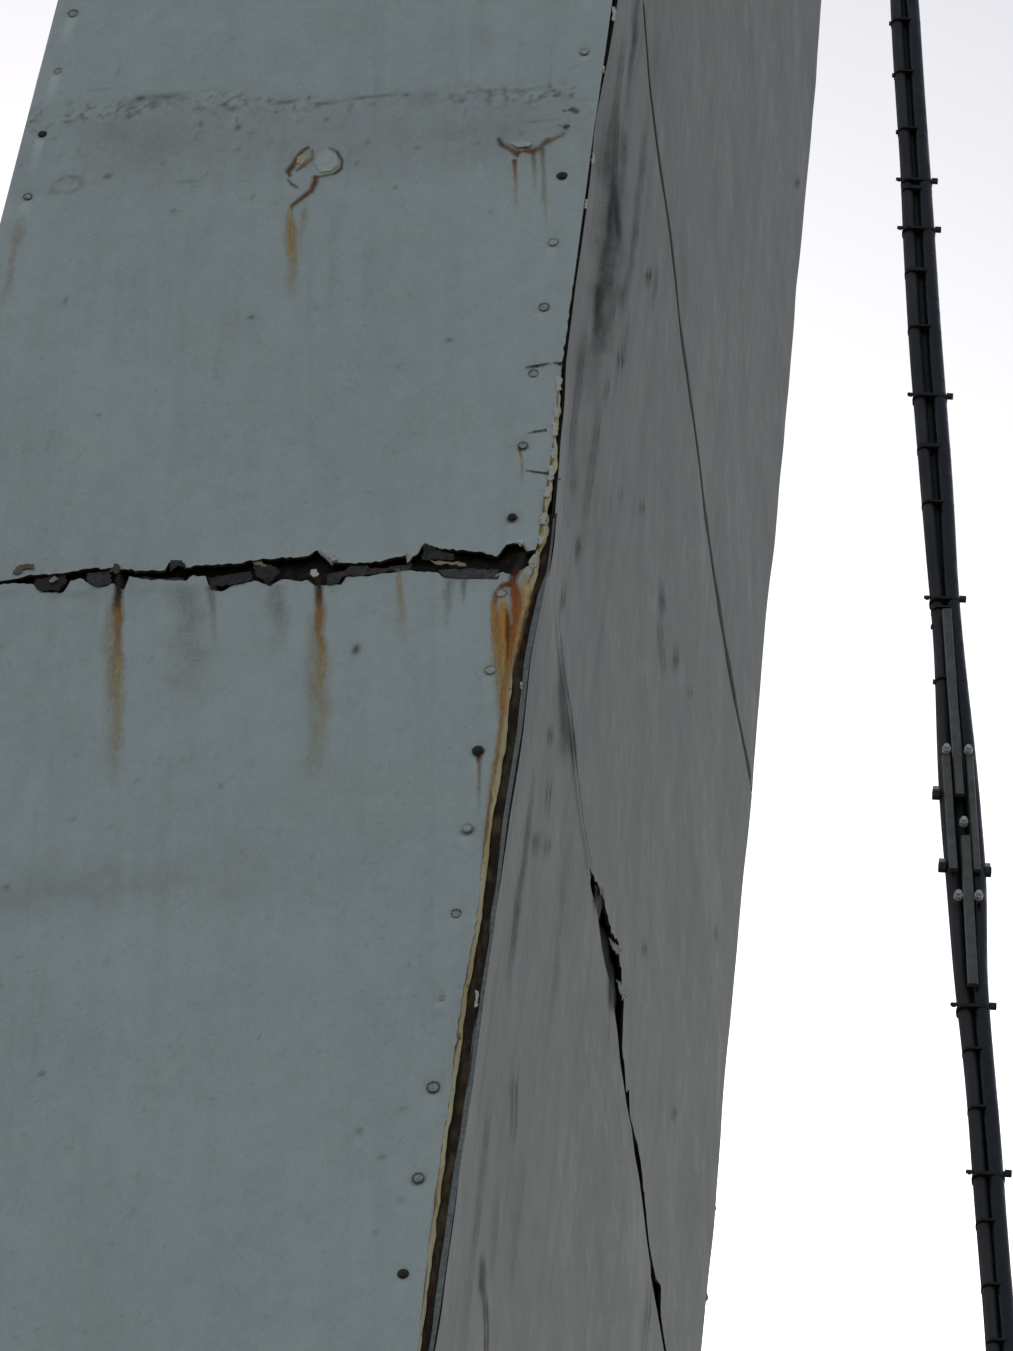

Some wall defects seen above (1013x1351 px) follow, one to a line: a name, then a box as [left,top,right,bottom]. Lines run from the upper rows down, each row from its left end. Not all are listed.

rust [286,146,343,278]
rust [497,107,578,198]
crack [0,539,539,593]
rust [108,572,122,748]
rust [311,576,326,728]
rust [418,390,561,1351]
crack [594,884,628,998]